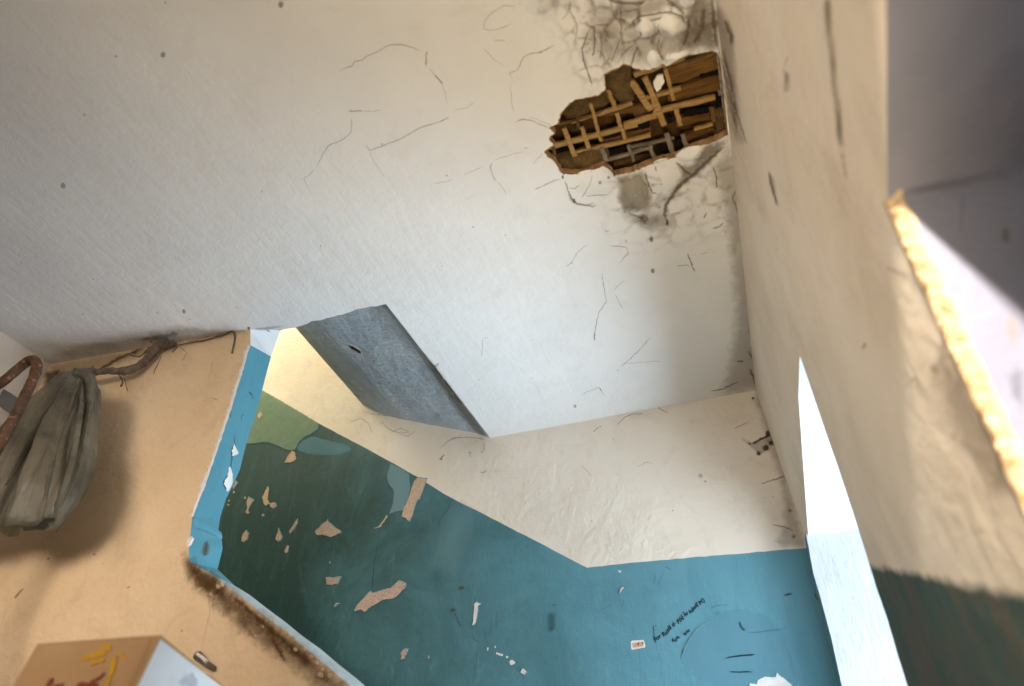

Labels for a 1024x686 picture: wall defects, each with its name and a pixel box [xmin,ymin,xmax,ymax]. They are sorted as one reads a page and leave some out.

leakage [668,0,733,43]
spalling [544,51,728,177]
leakage [620,167,656,210]
peeling [372,464,427,529]
peeling [275,518,298,553]
peeling [315,519,342,538]
leakage [189,562,336,686]
peeling [325,576,342,585]
peeling [354,580,406,613]
peeling [472,601,481,627]